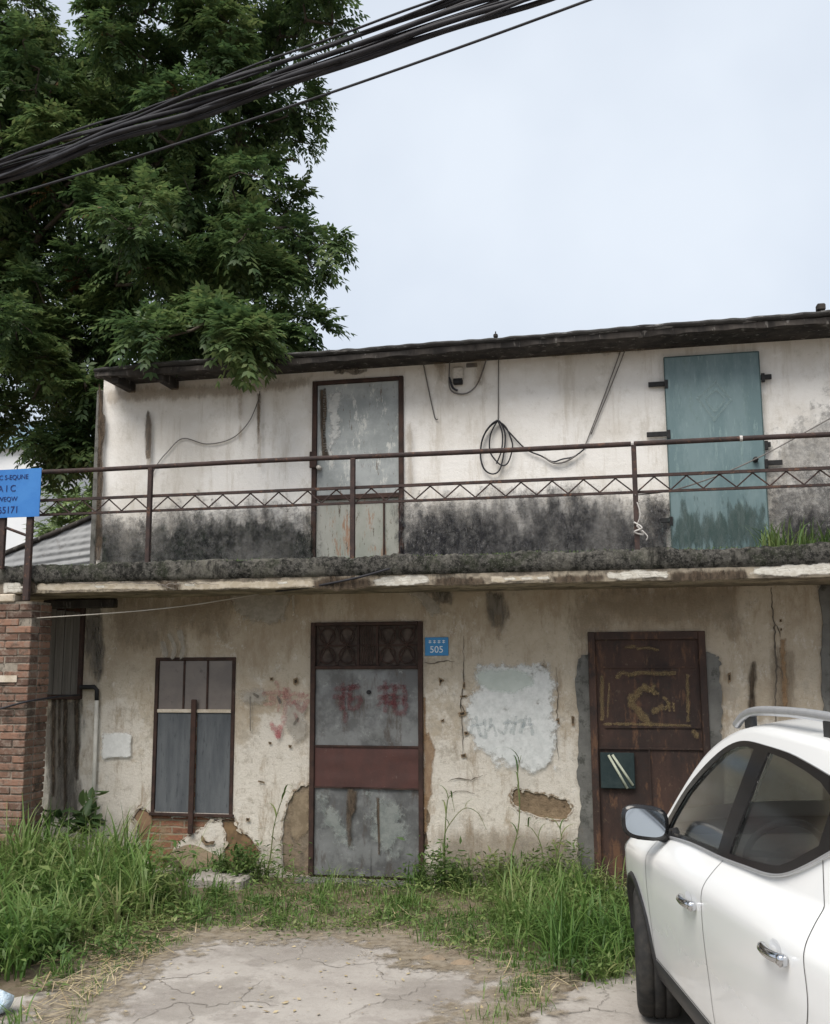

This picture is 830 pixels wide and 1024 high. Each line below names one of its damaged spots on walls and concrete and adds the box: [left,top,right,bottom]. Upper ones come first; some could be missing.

water stain [769,406,830,545]
water stain [93,499,313,563]
water stain [398,486,670,556]
water stain [436,577,509,629]
crack [771,588,784,720]
crack [425,636,483,794]
flaking render [131,805,259,870]
flaking render [280,783,319,877]
peeling [322,806,350,848]
corrosion [346,789,356,845]
flaking render [508,787,574,822]